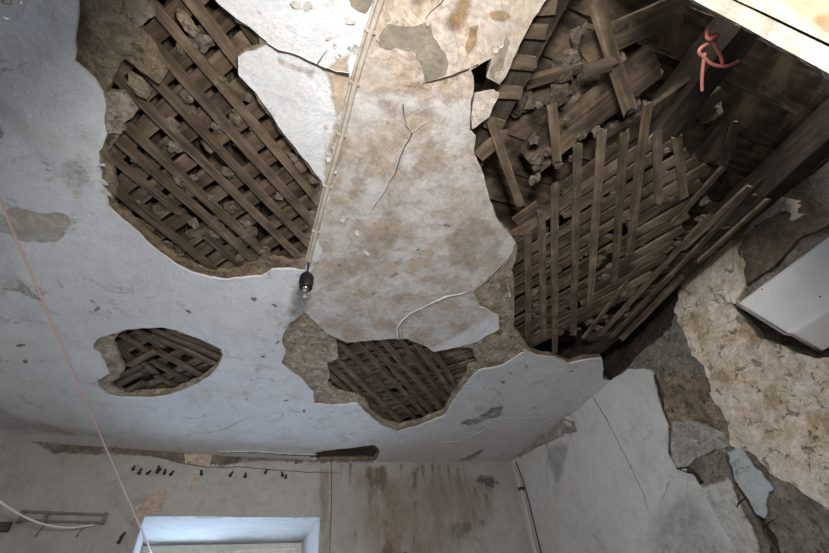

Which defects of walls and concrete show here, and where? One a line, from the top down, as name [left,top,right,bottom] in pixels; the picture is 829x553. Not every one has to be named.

flaking render [64,0,323,278]
crack [266,42,349,77]
crack [371,104,426,210]
water stain [326,0,546,208]
peeling [0,197,80,248]
water stain [314,180,508,345]
flaking render [275,0,829,553]
flaking render [93,327,223,397]
water stain [366,465,494,553]